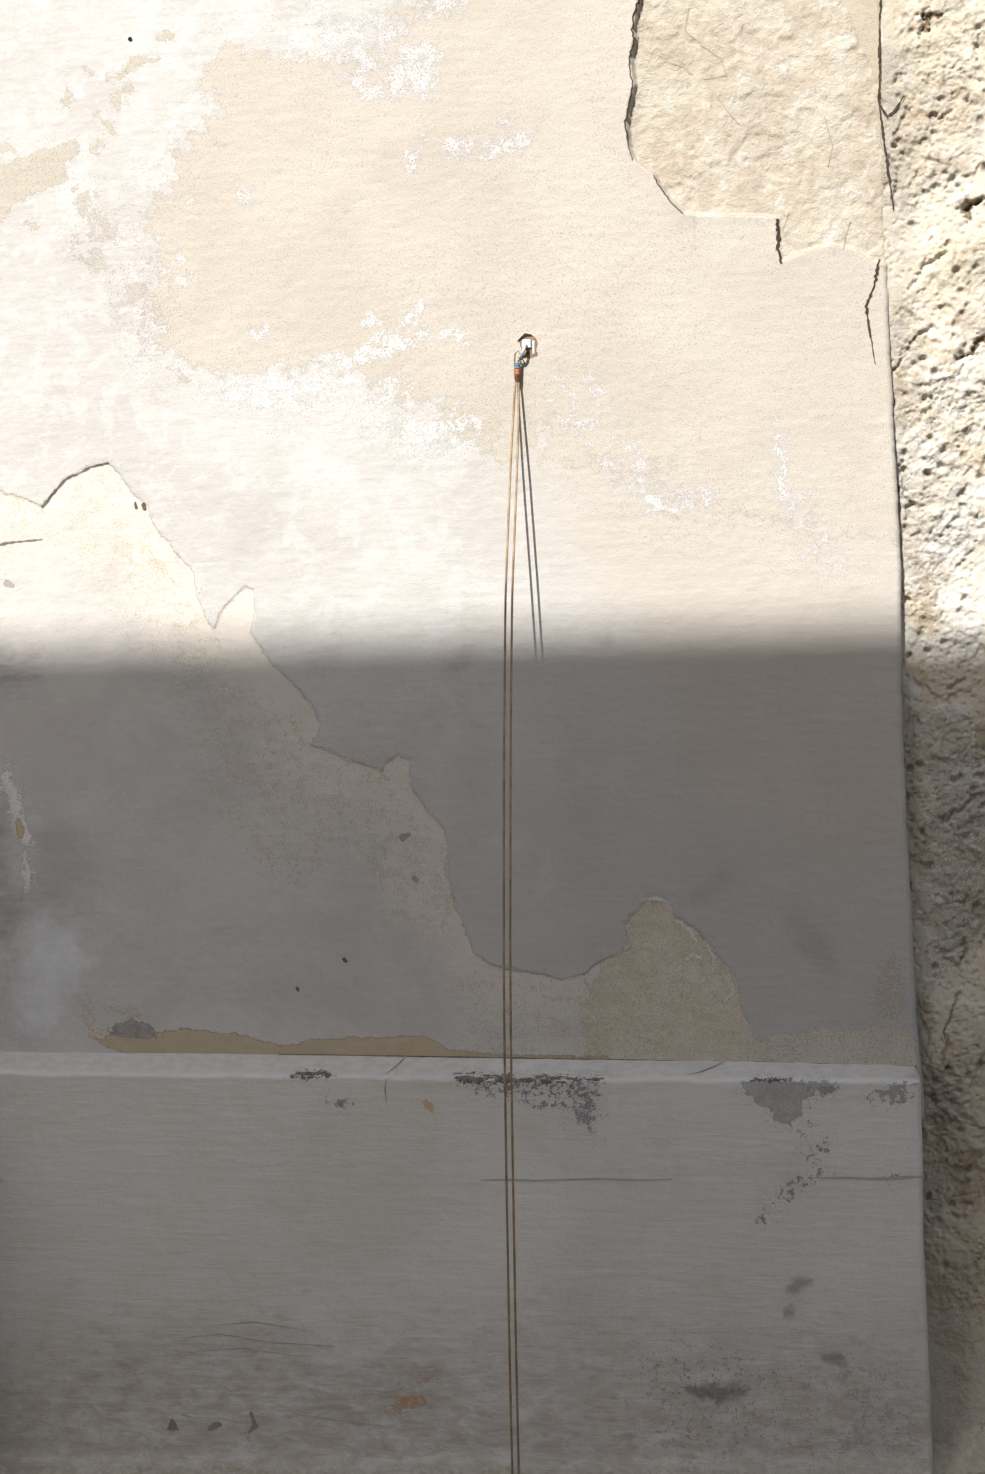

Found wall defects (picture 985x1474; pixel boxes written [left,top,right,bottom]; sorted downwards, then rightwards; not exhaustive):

crack [624,0,682,213]
crack [865,259,881,364]
peeling [0,0,920,1137]
water stain [473,1079,600,1134]